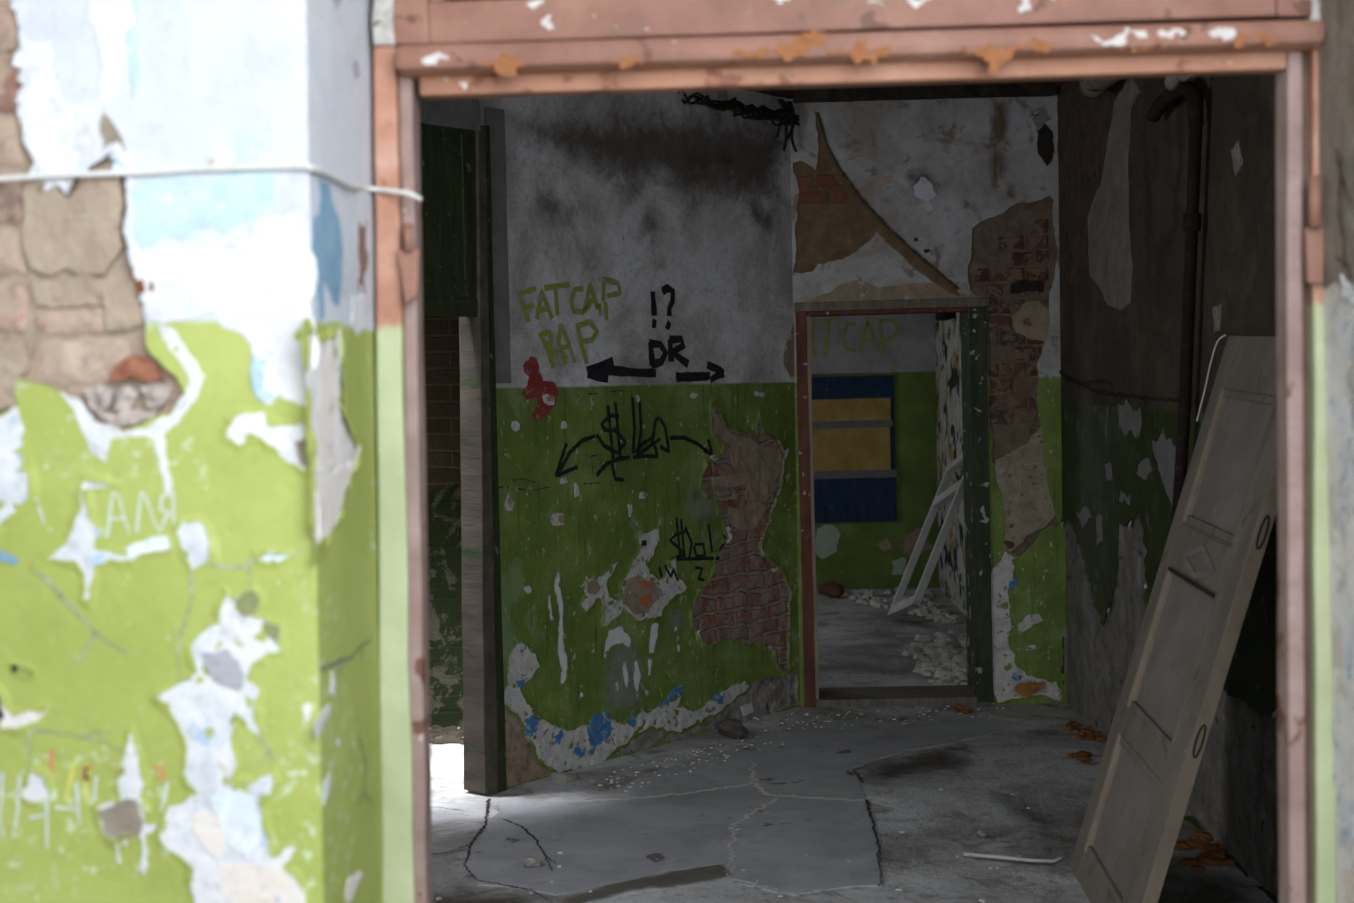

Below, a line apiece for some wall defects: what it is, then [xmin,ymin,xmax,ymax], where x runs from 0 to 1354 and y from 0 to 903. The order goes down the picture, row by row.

spalling [0,0,222,613]
spalling [793,86,1149,739]
peeling [1118,400,1188,504]
peeling [0,659,52,739]
peeling [89,307,363,903]
crack [434,799,555,903]
spalling [503,391,800,788]
crack [576,744,932,894]
spalling [1183,683,1279,903]